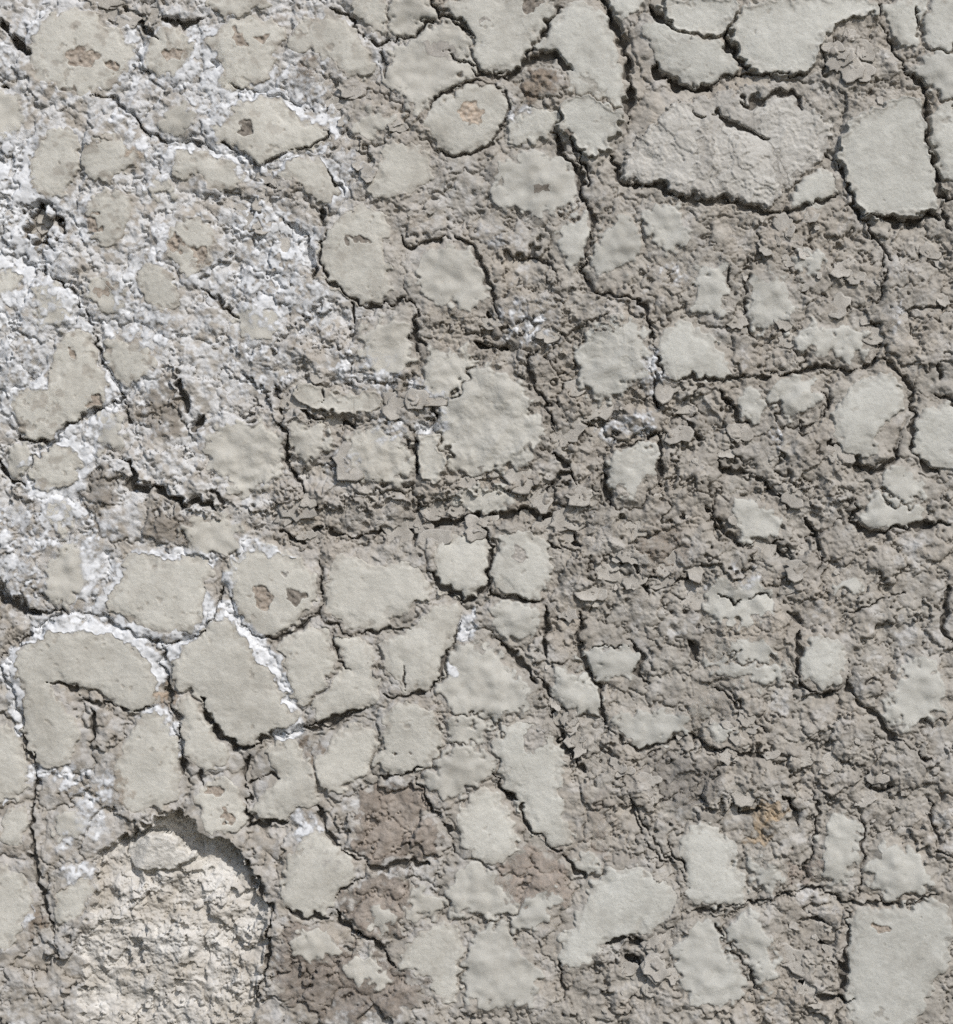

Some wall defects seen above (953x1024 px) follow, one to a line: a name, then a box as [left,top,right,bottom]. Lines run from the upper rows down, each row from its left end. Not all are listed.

efflorescence [0,132,177,434]
leakage [0,351,326,779]
crack [119,458,225,511]
crack [47,586,363,829]
leakage [95,24,362,398]
crack [256,805,430,997]
spalling [0,512,953,1024]
spalling [202,168,927,640]
crack [262,0,953,773]
crack [670,793,937,1003]
spalling [894,225,953,352]
peeling [908,400,953,470]